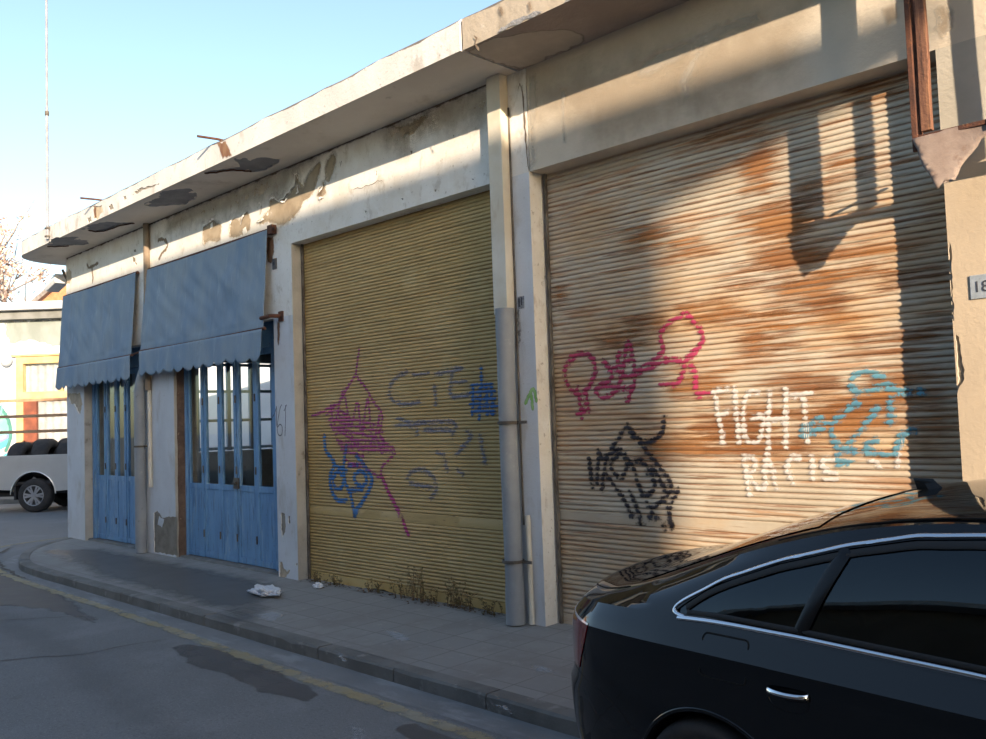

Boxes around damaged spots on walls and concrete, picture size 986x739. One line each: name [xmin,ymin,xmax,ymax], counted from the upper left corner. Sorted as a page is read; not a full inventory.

flaking render [202,155,342,245]
rust [619,223,708,257]
rust [674,124,950,364]
rust [599,315,669,354]
rust [641,368,951,462]
flaking render [154,511,178,556]